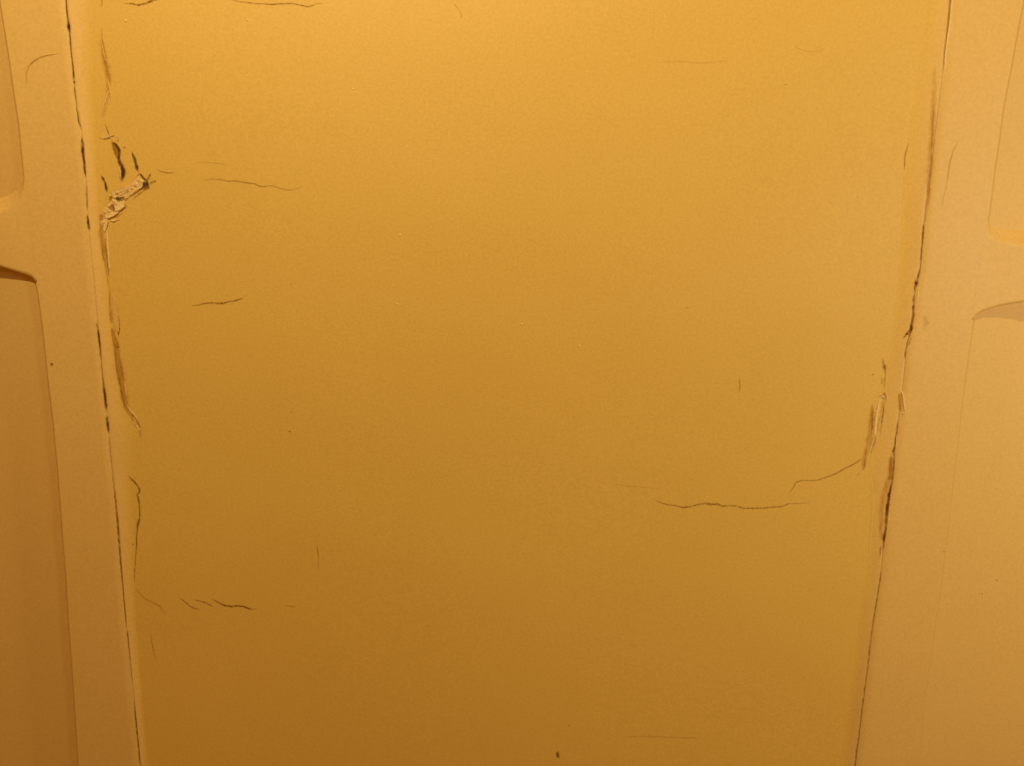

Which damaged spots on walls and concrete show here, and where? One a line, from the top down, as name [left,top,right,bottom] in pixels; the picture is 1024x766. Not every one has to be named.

spalling [99,175,156,232]
crack [884,225,924,368]